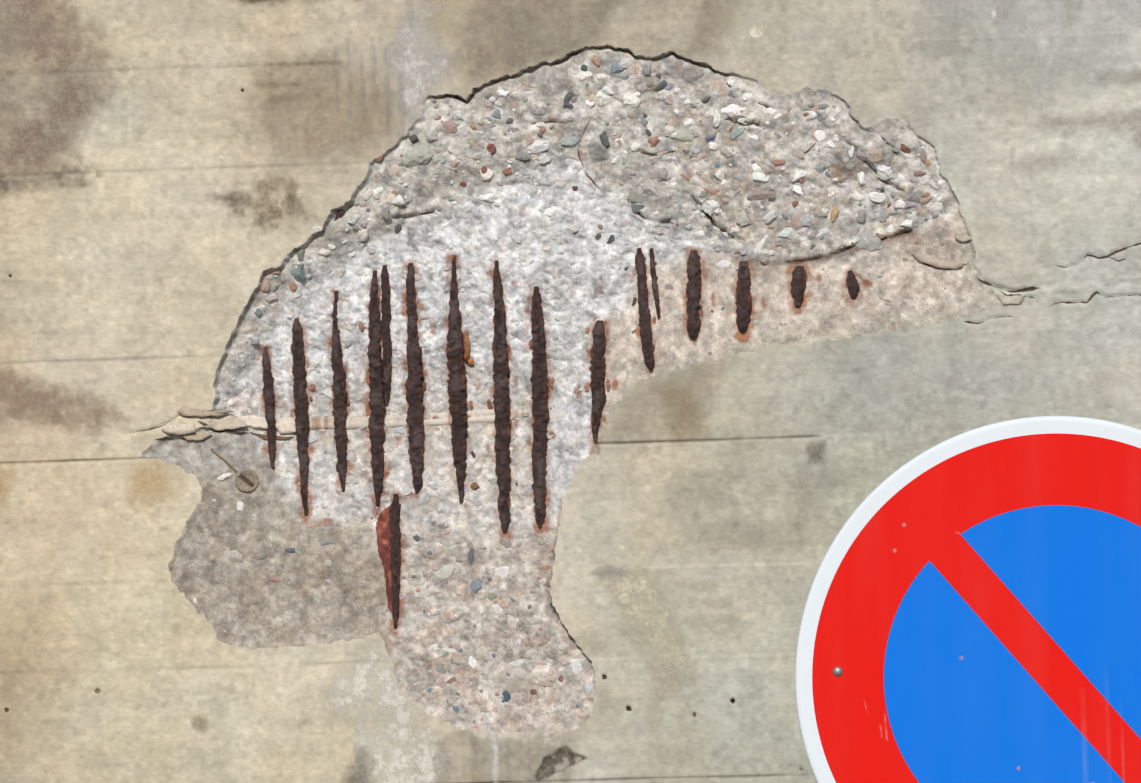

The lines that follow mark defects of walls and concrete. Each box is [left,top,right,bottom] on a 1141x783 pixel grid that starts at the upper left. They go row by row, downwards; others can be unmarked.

water stain [0,0,96,191]
water stain [0,375,103,426]
rust [291,318,315,522]
rust [328,291,350,492]
rust [359,263,433,634]
rust [444,255,480,503]
rust [487,260,518,538]
rust [526,286,555,532]
spalling [139,44,1025,736]
crack [964,279,1141,324]
crack [1057,243,1141,268]
peeling [536,746,585,780]